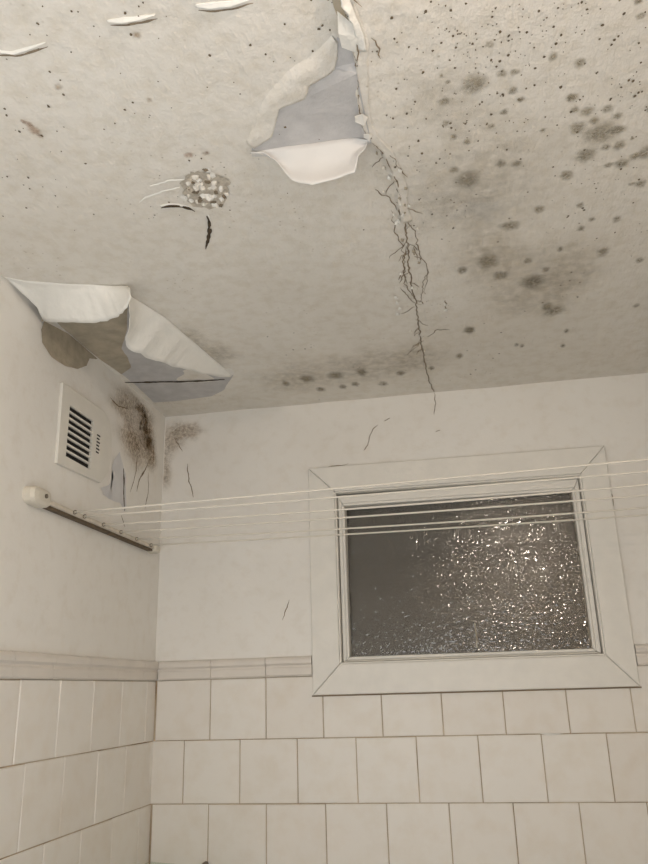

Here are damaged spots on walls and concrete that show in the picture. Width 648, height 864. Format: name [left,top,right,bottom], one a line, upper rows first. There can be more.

peeling [246,0,372,185]
damp [408,1,589,151]
damp [556,62,648,180]
crack [345,0,449,432]
peeling [5,277,234,403]